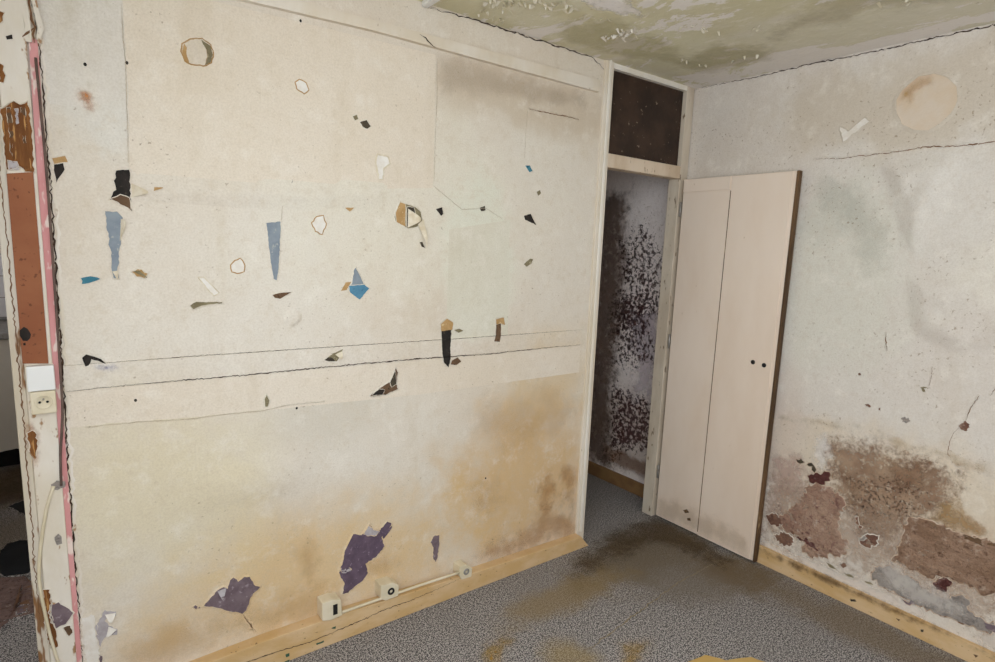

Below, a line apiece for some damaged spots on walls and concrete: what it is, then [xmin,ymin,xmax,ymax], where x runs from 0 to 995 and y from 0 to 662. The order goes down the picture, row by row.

peeling [0,100,36,173]
water stain [589,194,664,477]
peeling [192,575,262,615]
peeling [337,520,393,596]
spalling [765,458,880,578]
water stain [763,439,980,616]
spalling [865,517,995,635]